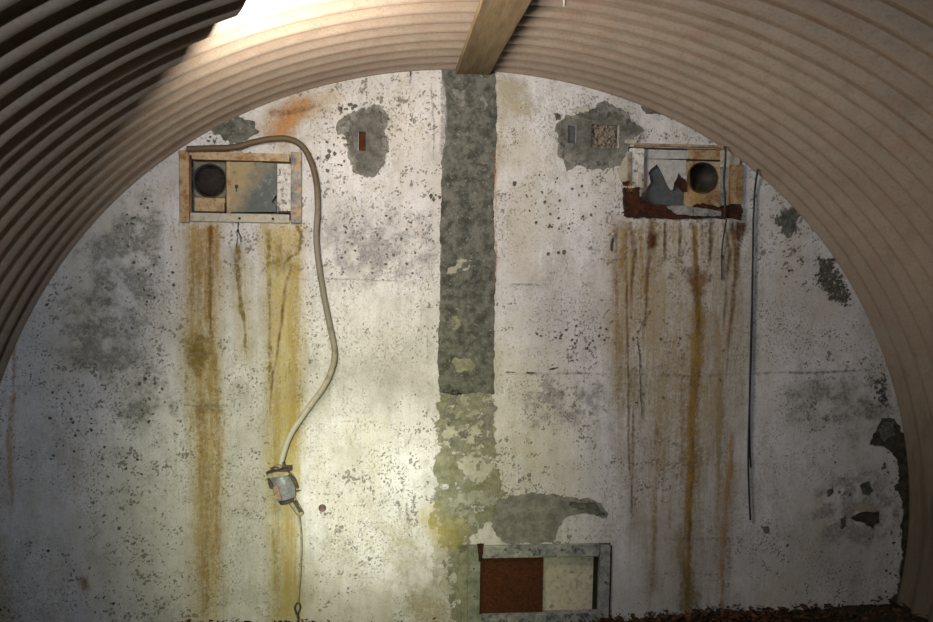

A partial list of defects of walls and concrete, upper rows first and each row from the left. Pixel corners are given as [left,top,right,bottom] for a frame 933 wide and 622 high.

rust [187,227,219,597]
spalling [205,116,259,152]
rust [264,226,302,472]
spalling [313,103,390,178]
peeling [428,70,613,622]
spalling [555,101,644,183]
rust [614,154,745,609]
peeling [775,207,854,307]
spalling [827,474,880,540]
spalling [869,364,909,605]